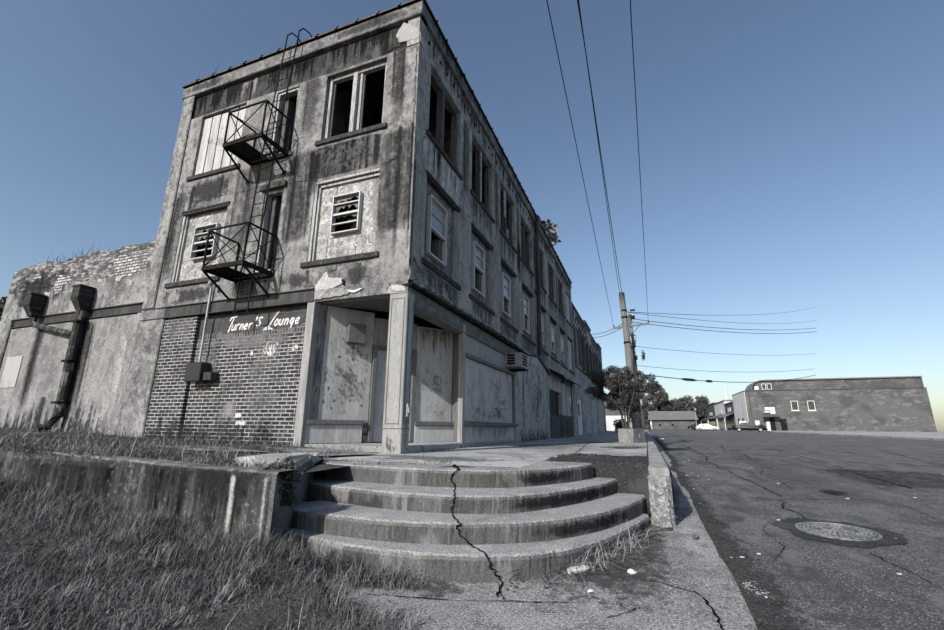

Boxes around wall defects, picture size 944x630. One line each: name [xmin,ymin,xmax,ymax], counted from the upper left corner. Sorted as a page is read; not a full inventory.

flaking render [396,23,426,56]
leakage [233,124,416,294]
leakage [15,270,64,307]
flaking render [314,264,363,300]
leakage [0,322,128,433]
leakage [139,465,251,532]
crack [446,464,503,597]